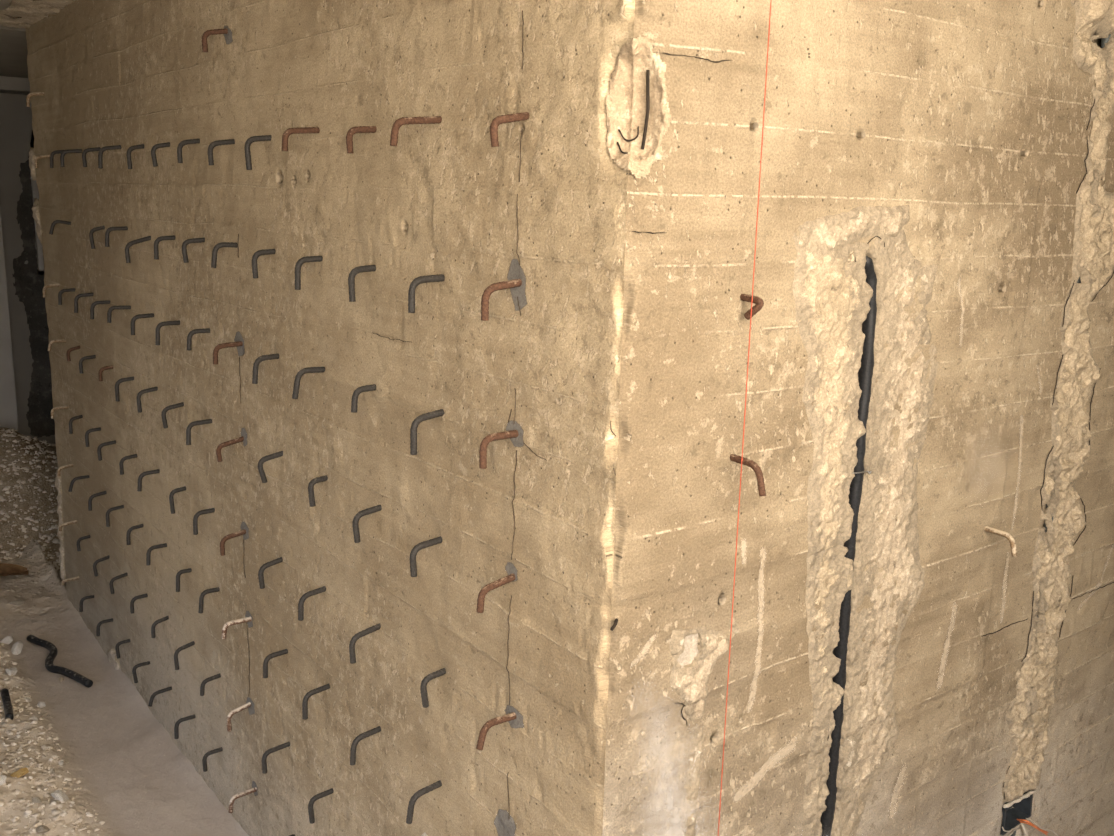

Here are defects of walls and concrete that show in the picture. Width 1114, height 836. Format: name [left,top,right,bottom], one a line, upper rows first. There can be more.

flaking render [0,0,75,28]
crack [519,11,527,68]
spalling [606,37,672,178]
crack [515,131,523,265]
spalling [1002,0,1114,804]
crack [508,388,546,560]
spalling [792,205,939,836]
crack [505,595,513,705]